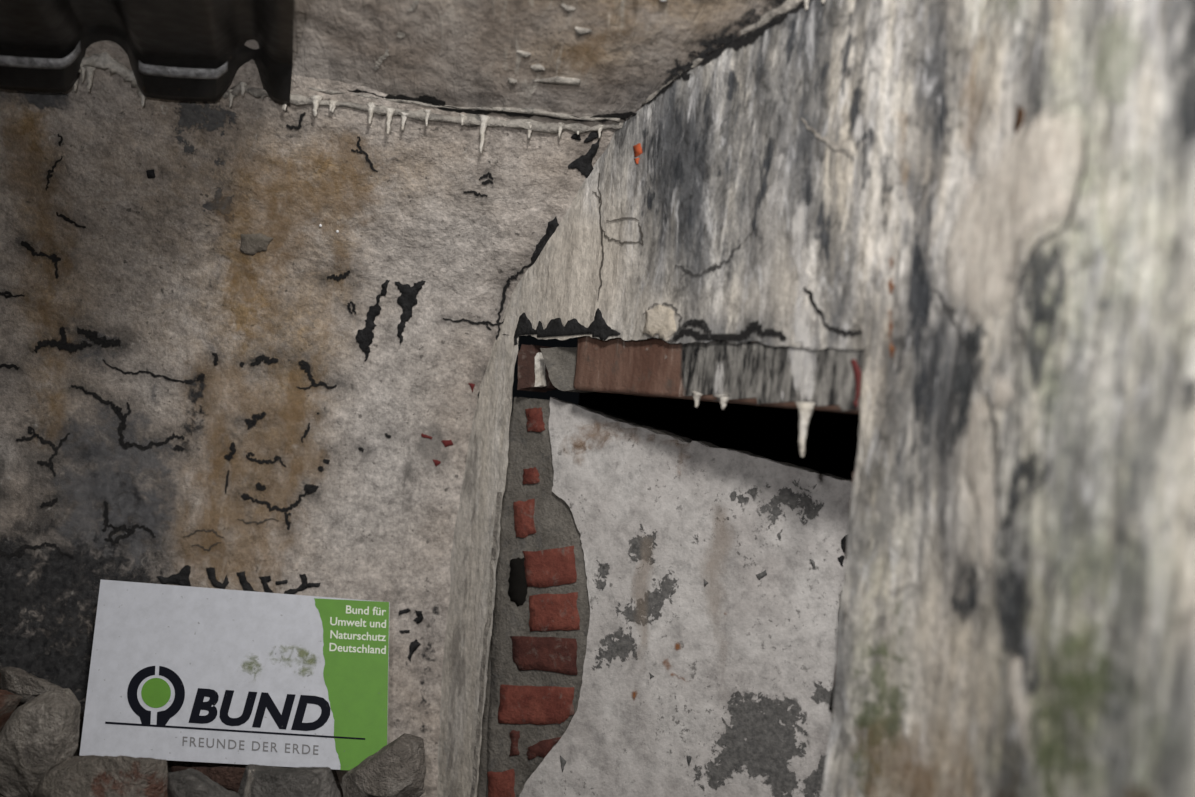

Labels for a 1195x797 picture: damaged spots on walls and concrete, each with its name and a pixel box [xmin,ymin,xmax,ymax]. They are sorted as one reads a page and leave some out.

crack [347,0,805,123]
leakage [815,14,892,203]
crack [443,234,550,344]
crack [644,302,787,342]
leakage [684,171,830,400]
leakage [908,207,930,420]
leakage [0,377,206,712]
crack [0,326,337,551]
spalling [522,467,540,485]
flaking render [730,478,824,540]
spalling [470,492,679,797]
flaking render [686,681,832,797]